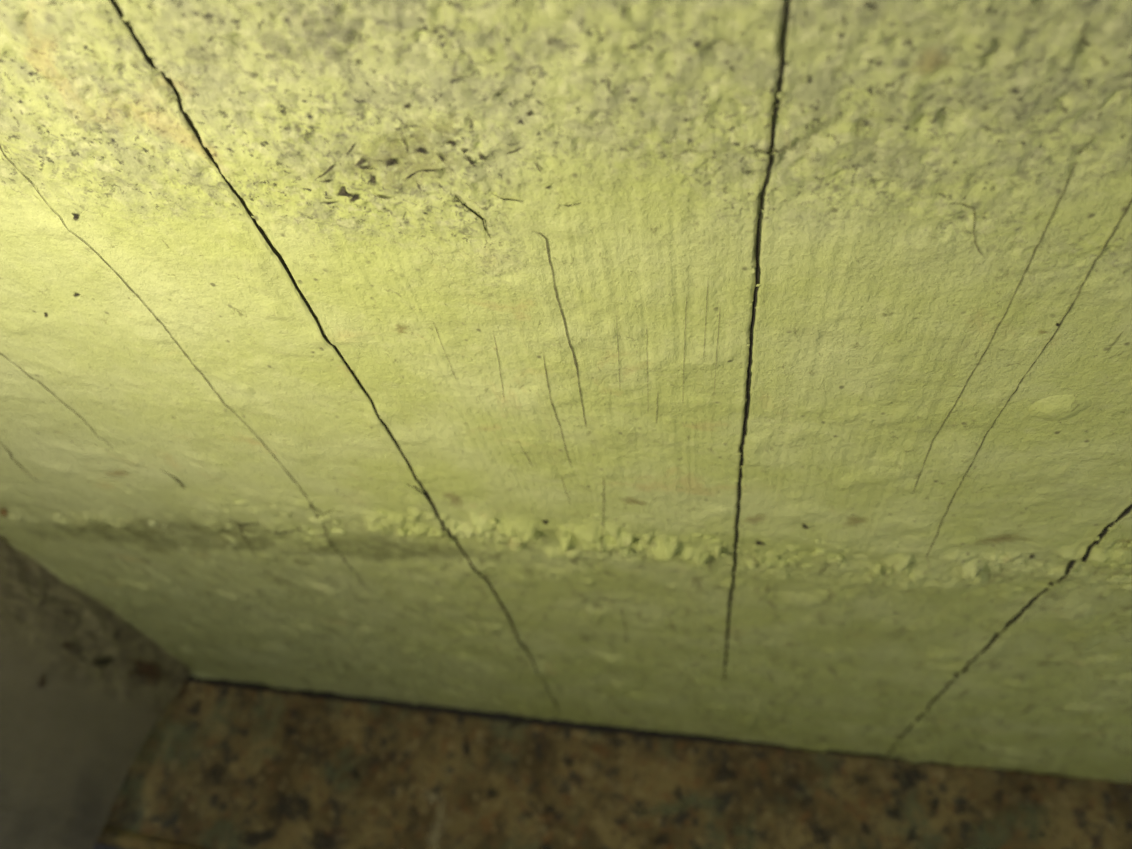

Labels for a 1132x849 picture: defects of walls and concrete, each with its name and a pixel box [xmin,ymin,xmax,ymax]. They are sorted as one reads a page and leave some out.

crack [0,147,372,594]
crack [109,0,562,714]
crack [538,233,586,499]
crack [683,290,720,369]
crack [721,0,792,680]
crack [913,142,1132,556]
crack [887,504,1132,755]